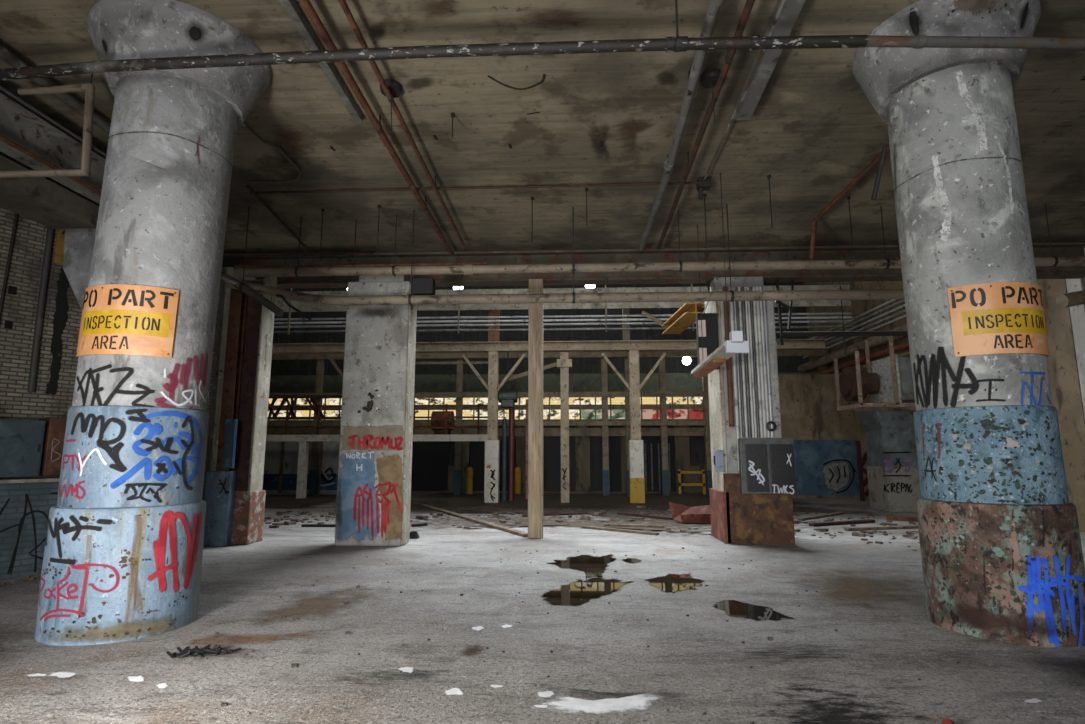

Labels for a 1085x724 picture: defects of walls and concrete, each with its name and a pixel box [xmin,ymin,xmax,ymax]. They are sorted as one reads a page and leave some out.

damp [370,24,384,38]
damp [620,121,650,146]
peeling [921,410,1057,504]
peeling [924,511,1053,603]
rust [947,605,1051,634]